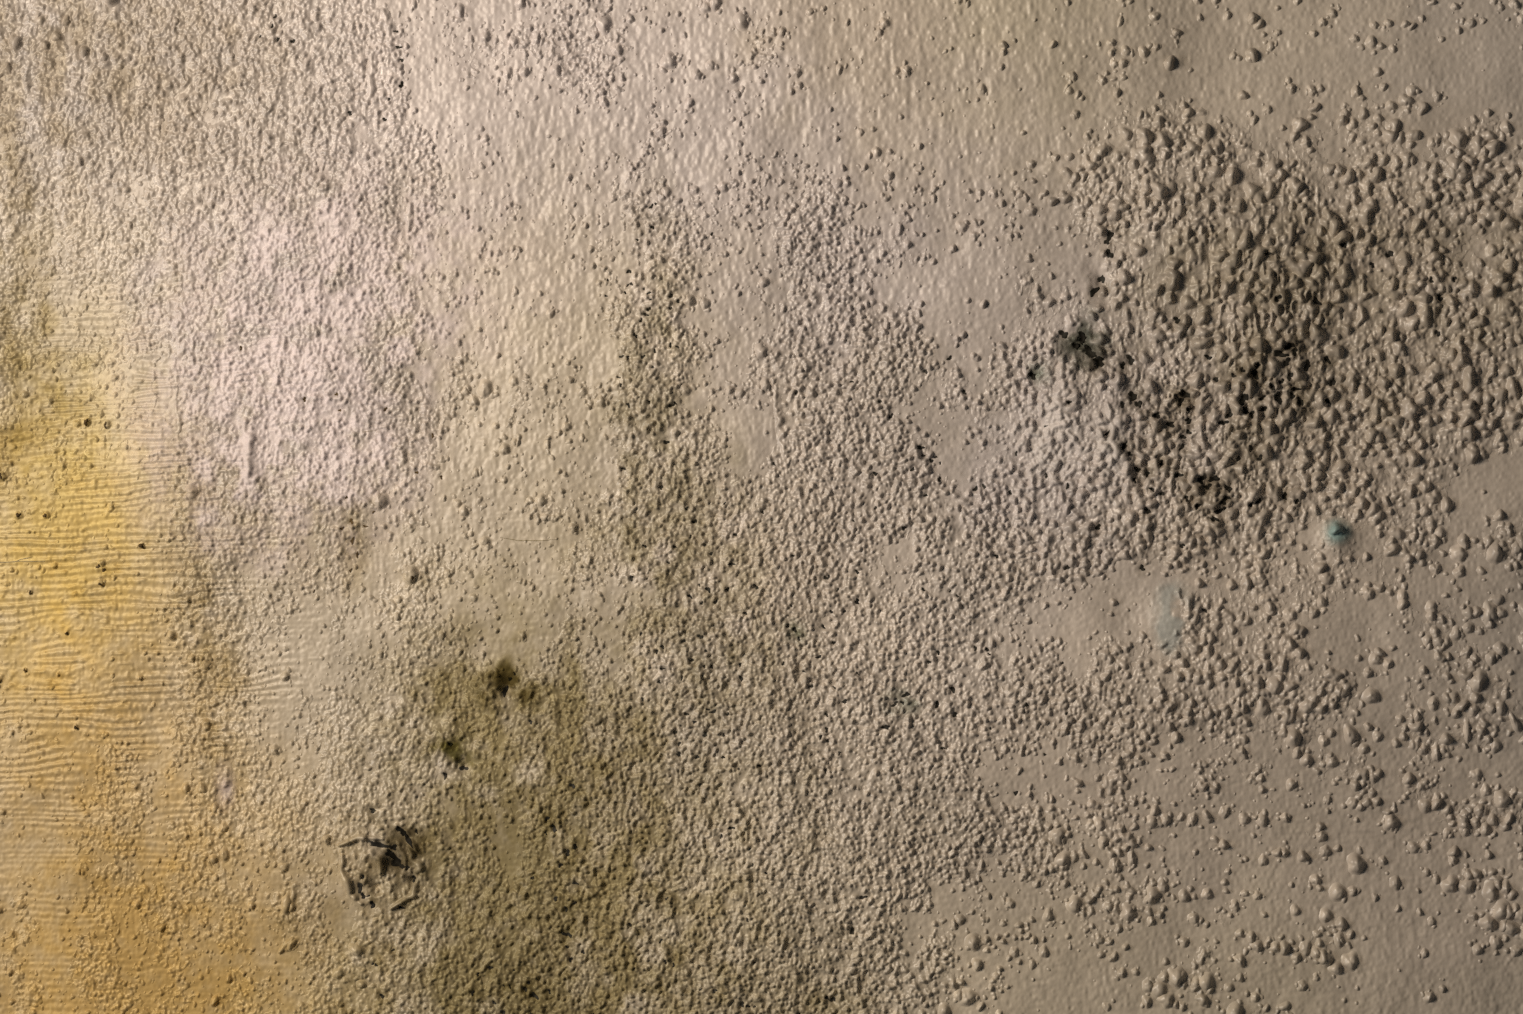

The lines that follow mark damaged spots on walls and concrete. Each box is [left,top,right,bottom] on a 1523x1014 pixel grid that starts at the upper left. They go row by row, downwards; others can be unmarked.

water stain [1104,230,1114,258]
water stain [1090,275,1105,297]
water stain [1058,330,1135,370]
water stain [1204,343,1336,425]
water stain [1120,389,1192,451]
water stain [1102,430,1233,522]
water stain [126,205,408,848]
flaking render [255,106,1087,1014]
water stain [655,634,713,684]
water stain [370,826,418,883]
water stain [357,875,375,908]
water stain [0,866,93,1014]